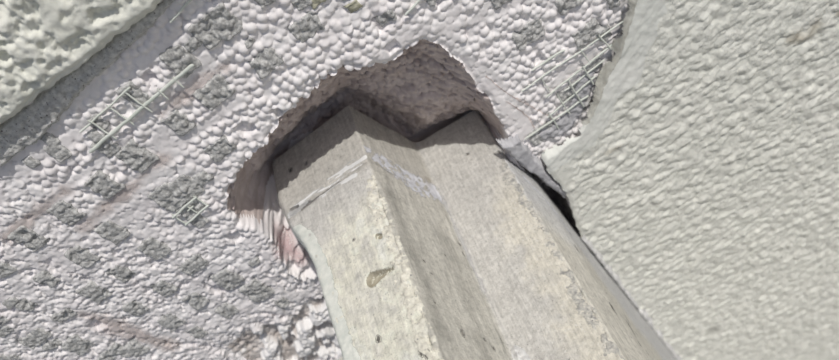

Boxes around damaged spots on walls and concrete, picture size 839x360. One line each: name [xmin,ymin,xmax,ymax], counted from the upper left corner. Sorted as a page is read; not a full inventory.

spalling [226,39,506,224]
spalling [581,0,638,125]
spalling [228,224,361,360]
spalling [366,171,444,360]
spalling [497,150,625,360]